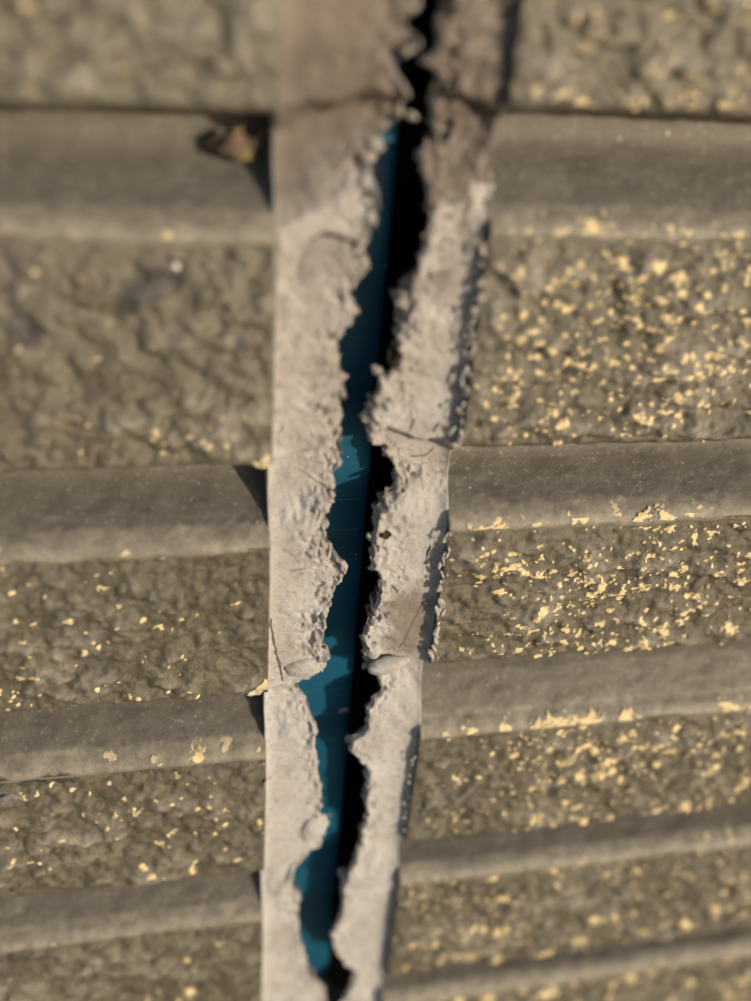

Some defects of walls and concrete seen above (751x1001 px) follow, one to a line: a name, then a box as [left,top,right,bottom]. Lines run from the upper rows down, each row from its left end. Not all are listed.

crack [354,135,385,168]
crack [389,0,448,173]
crack [309,232,369,315]
crack [294,364,435,635]
crack [269,618,318,730]
crack [399,595,424,648]
crack [329,769,366,953]
crack [292,866,352,1001]